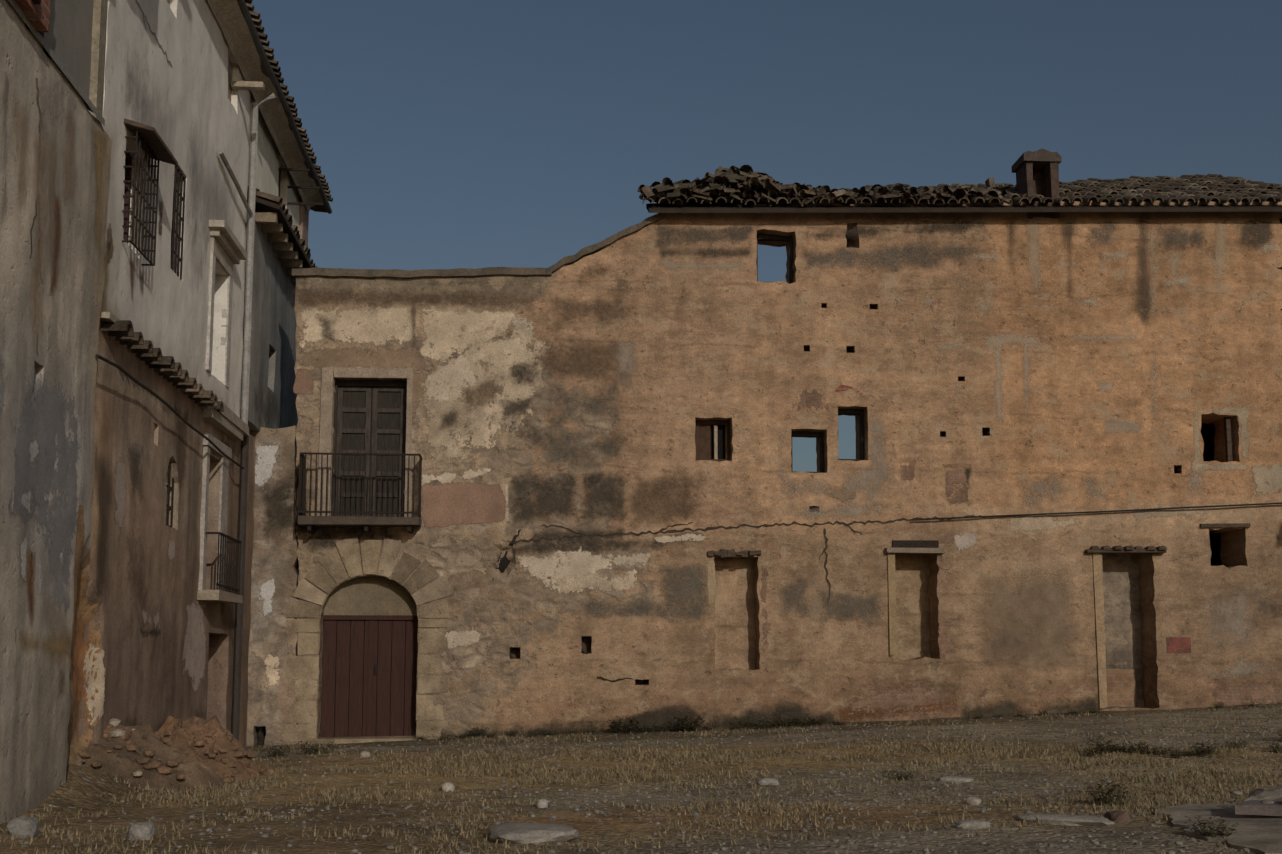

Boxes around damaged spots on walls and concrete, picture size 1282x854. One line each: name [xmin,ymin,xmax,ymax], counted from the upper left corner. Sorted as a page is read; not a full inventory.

crack [30,78,46,354]
flaking render [293,302,706,595]
peeling [9,375,105,781]
flaking render [707,560,716,604]
crack [513,515,985,599]
flaking render [182,597,207,691]
flaking render [440,627,496,674]